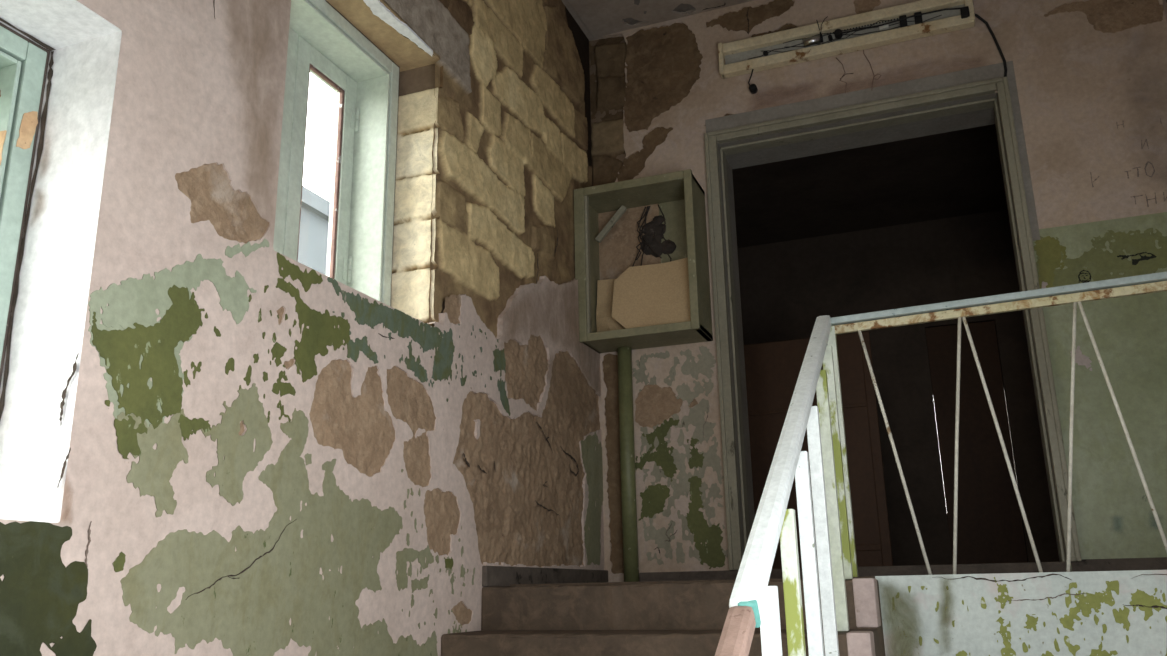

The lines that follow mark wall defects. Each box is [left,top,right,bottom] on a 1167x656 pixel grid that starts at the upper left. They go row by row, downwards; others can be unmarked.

spalling [706,0,797,37]
spalling [1044,0,1164,33]
peeling [1033,228,1167,289]
flaking render [88,0,703,656]
peeling [632,346,728,569]
peeling [0,521,97,656]
crack [187,521,294,598]
peeling [962,577,1167,656]
crack [1125,574,1167,609]